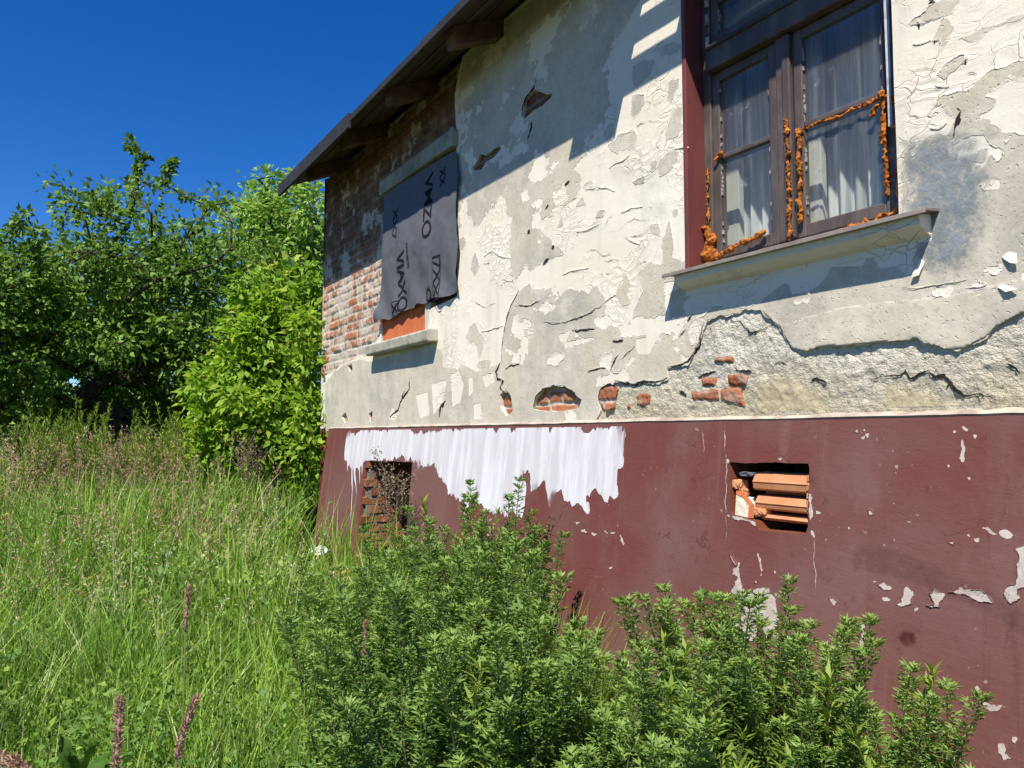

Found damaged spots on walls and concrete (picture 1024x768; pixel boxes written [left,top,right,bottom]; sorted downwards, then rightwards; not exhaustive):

crack [912,1,974,137]
flaking render [322,0,1024,431]
damp [907,139,986,266]
crack [479,155,789,406]
crack [390,373,410,417]
crack [872,370,1006,403]
peeling [729,553,781,641]
peeling [873,527,1024,612]